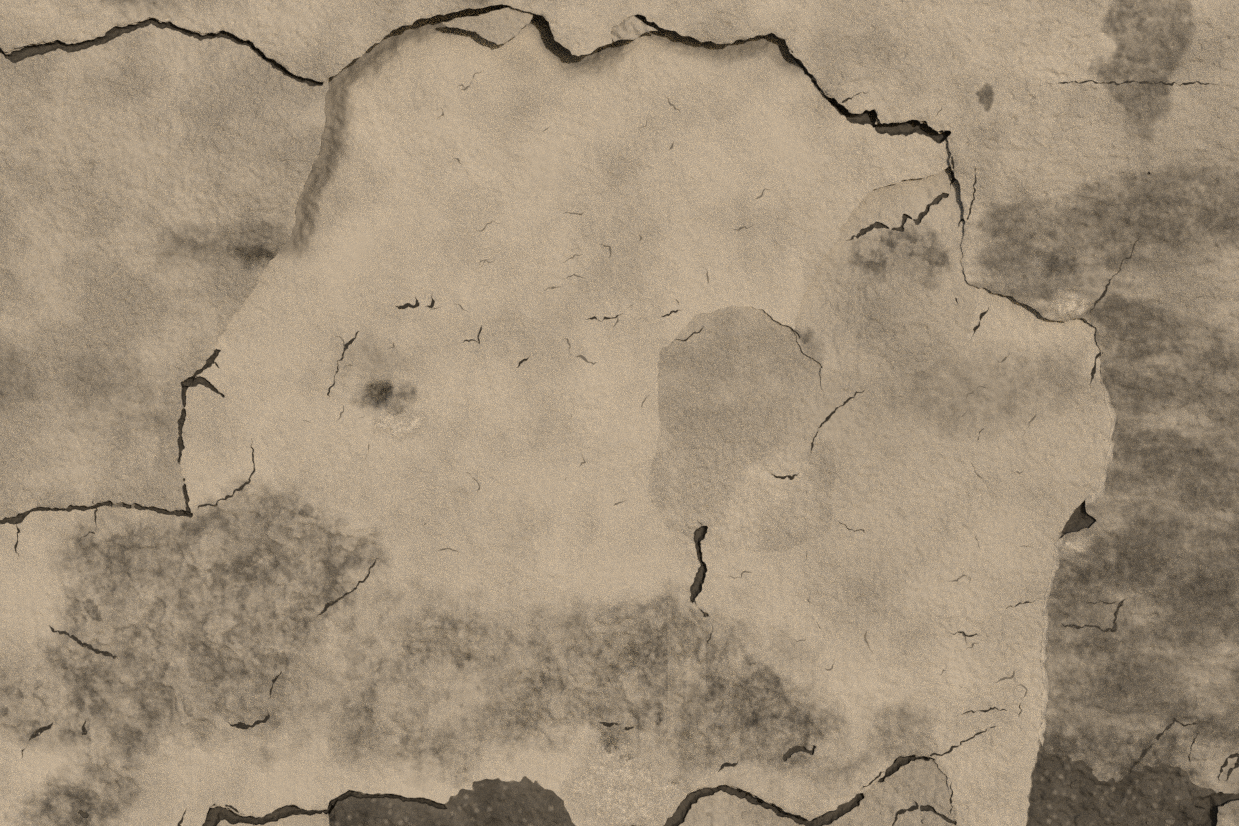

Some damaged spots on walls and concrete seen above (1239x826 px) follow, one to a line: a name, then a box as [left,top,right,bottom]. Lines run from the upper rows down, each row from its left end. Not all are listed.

crack [0,18,323,86]
crack [787,46,977,241]
flaking render [180,4,1112,746]
crack [0,349,255,556]
damp [70,510,238,631]
damp [150,531,372,686]
damp [56,633,172,756]
crack [177,790,447,826]
flaking render [208,776,576,826]
damp [564,730,683,826]
flaking render [679,755,957,826]
flaking render [1026,739,1215,826]